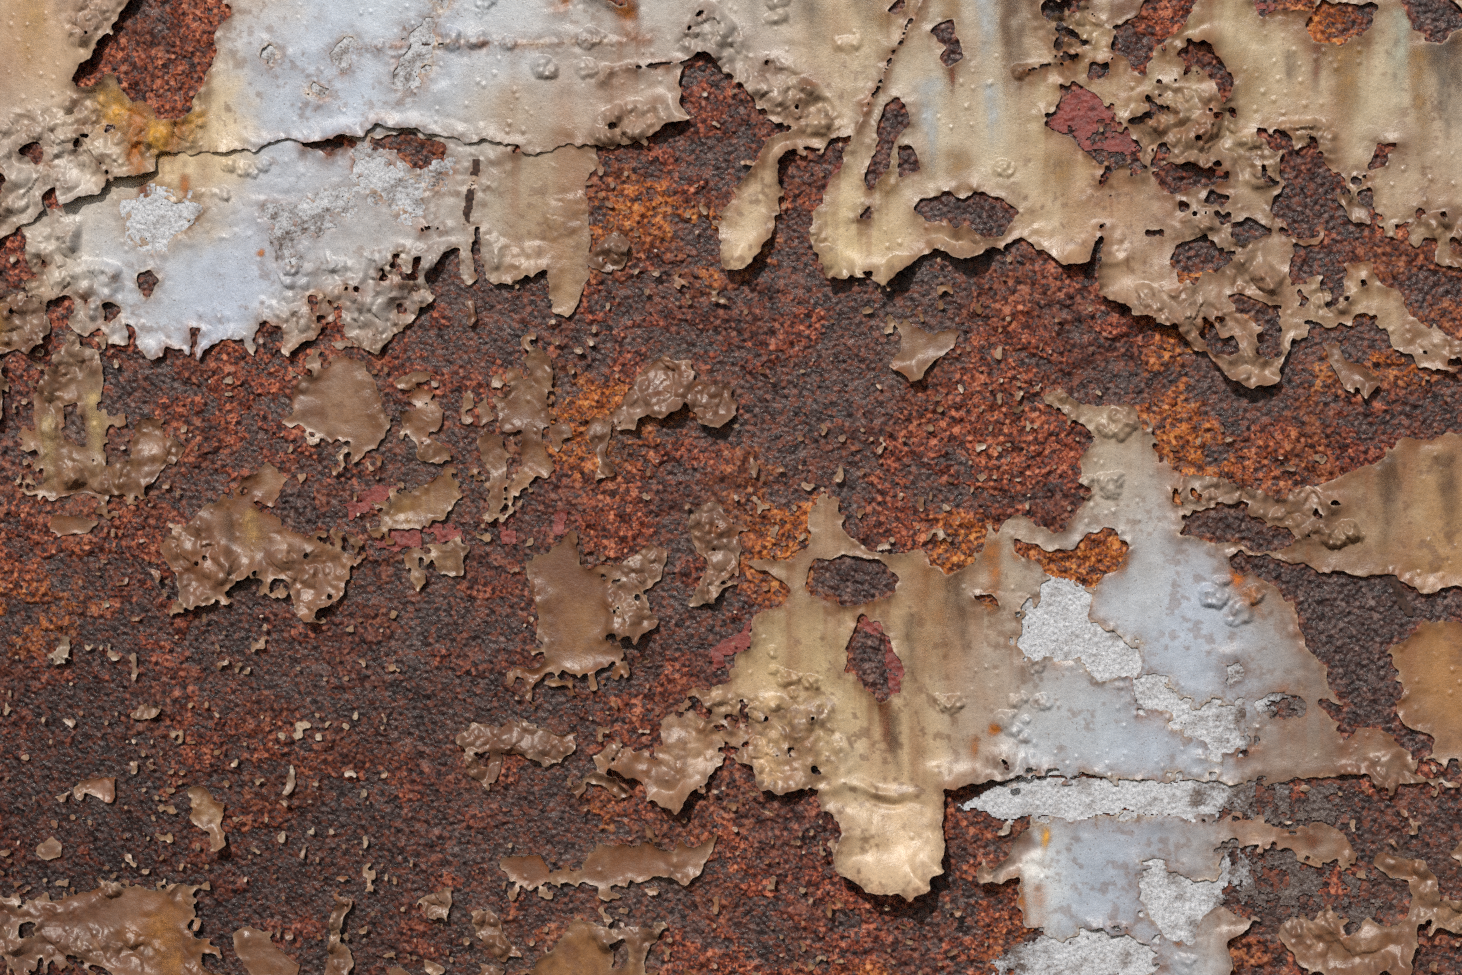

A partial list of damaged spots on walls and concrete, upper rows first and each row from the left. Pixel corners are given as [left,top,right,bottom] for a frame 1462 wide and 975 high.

rust [580,176,719,321]
peeling [0,0,1462,630]
rust [0,493,200,662]
rust [151,332,353,495]
rust [112,682,412,836]
peeling [456,721,577,791]
peeling [507,531,667,701]
rust [728,476,819,561]
rust [852,288,1125,614]
peeling [570,388,1462,975]
peeling [0,869,300,975]
peeling [420,888,452,920]